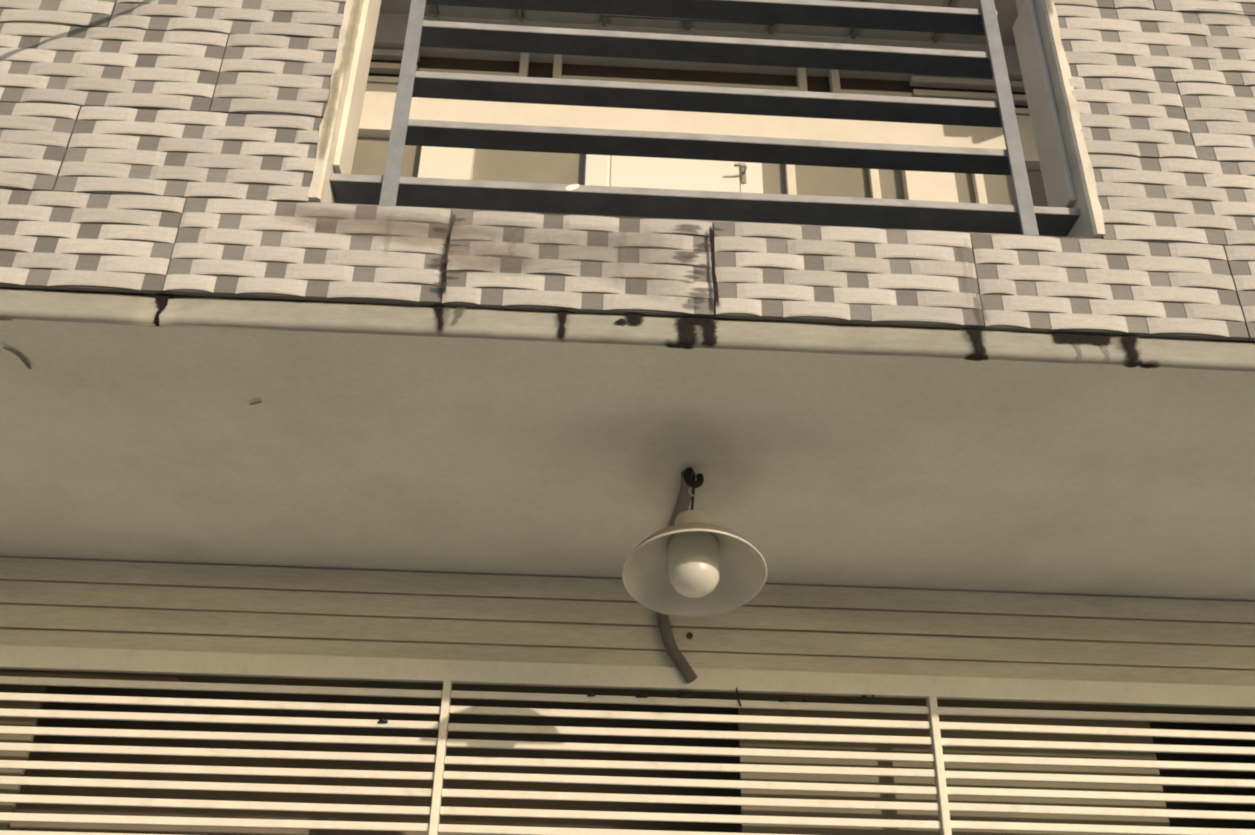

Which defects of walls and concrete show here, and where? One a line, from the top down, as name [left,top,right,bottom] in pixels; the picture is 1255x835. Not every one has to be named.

damp [665,224,722,349]
damp [964,328,988,361]
damp [1053,333,1159,368]